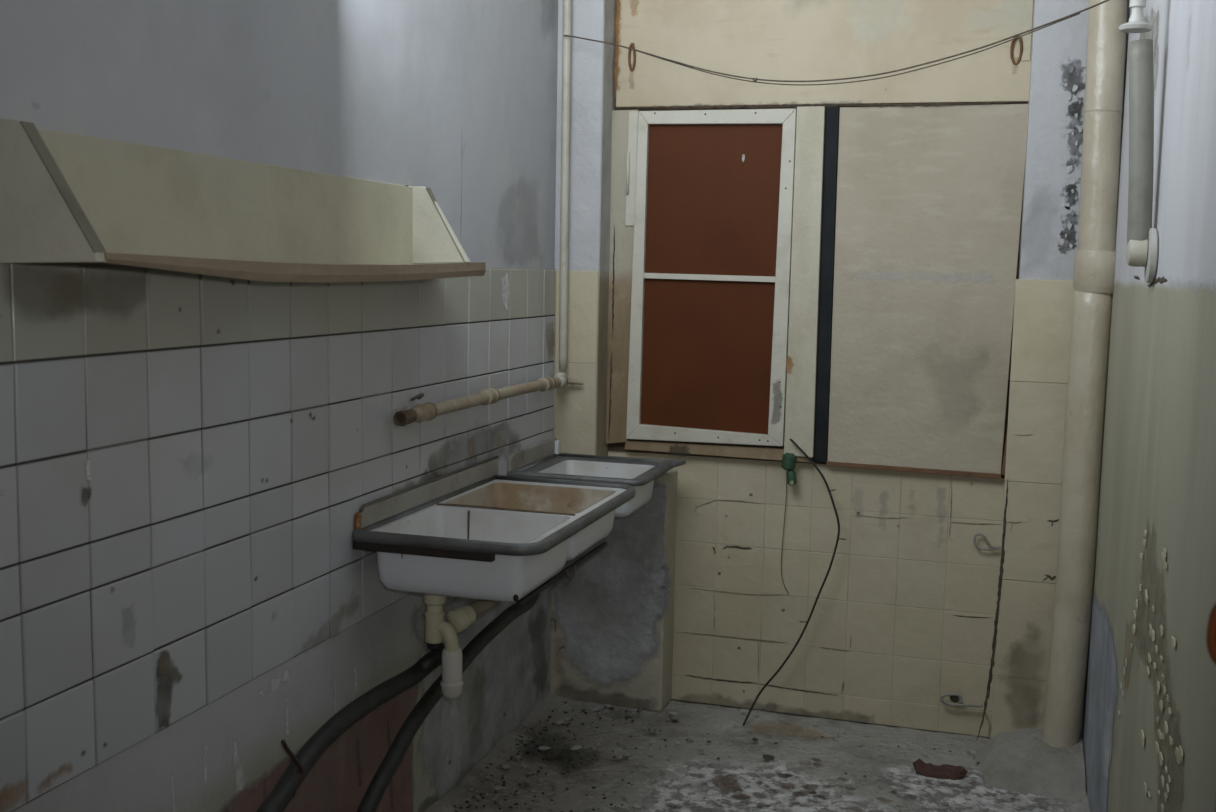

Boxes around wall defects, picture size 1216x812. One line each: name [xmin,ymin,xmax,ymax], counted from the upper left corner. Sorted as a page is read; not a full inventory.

leakage [157,651,181,728]
peeling [224,759,292,812]
peeling [283,665,442,812]
peeling [376,486,671,812]
crack [949,479,1059,739]